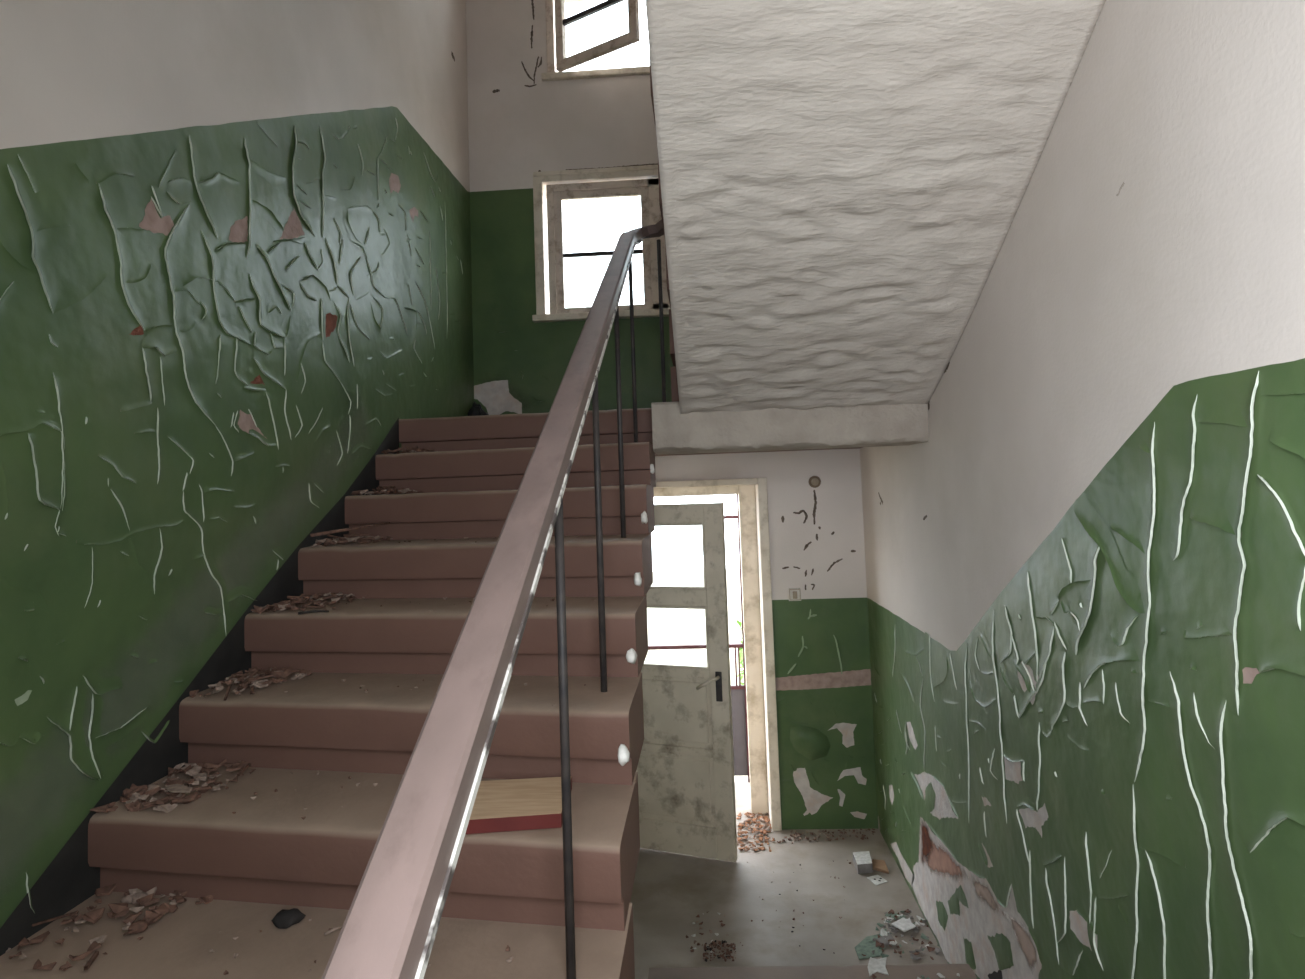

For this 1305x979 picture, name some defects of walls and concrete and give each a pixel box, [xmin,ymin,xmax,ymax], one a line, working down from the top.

peeling [139,195,174,236]
peeling [229,216,248,243]
flaking render [325,312,338,338]
peeling [234,407,267,439]
peeling [1017,661,1046,705]
peeling [1242,667,1259,684]
peeling [904,720,918,751]
peeling [780,723,880,831]
peeling [1003,748,1048,837]
peeling [891,770,1044,979]
peeling [1069,902,1098,951]